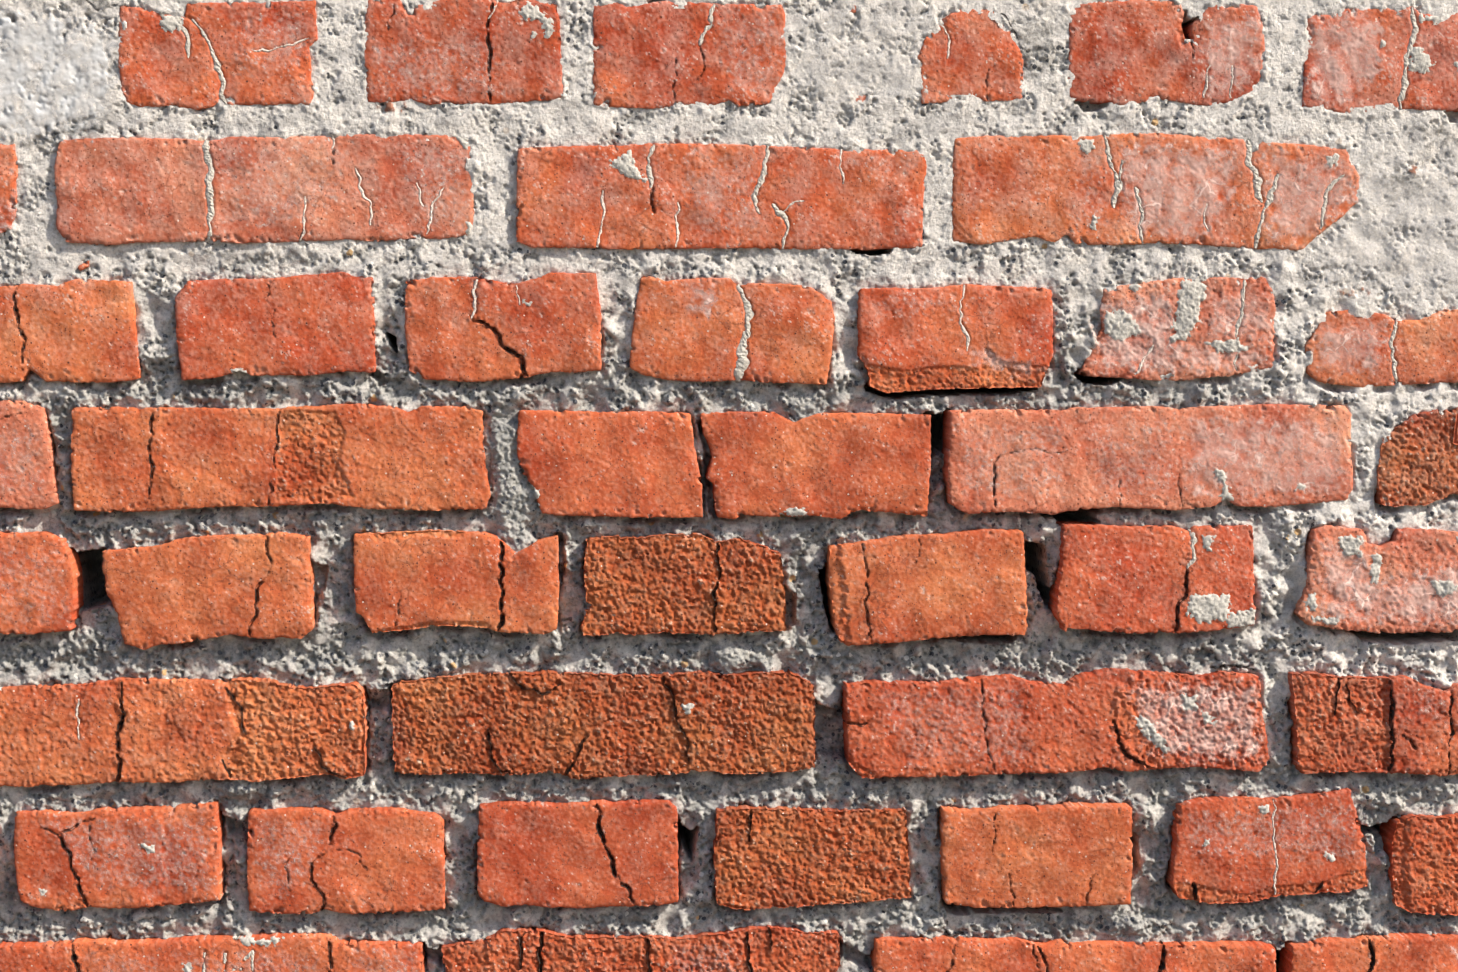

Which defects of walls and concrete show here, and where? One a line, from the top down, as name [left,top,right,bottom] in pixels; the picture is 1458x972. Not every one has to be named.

crack [596,190,606,247]
crack [646,145,680,247]
crack [751,145,804,249]
crack [471,279,526,373]
crack [734,284,754,381]
crack [1334,678,1455,773]
crack [44,818,95,906]
crack [596,812,633,902]
crack [71,940,80,972]
crack [519,933,543,972]
crack [1158,940,1166,972]
crack [1366,936,1375,972]